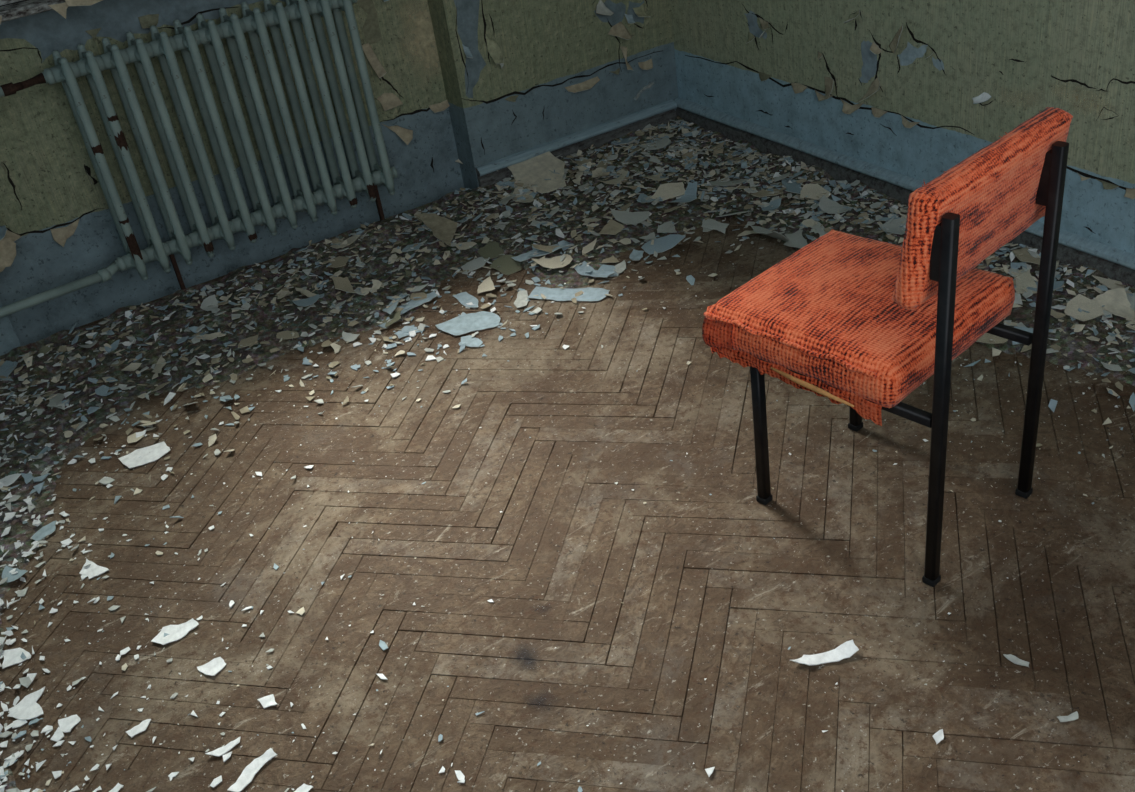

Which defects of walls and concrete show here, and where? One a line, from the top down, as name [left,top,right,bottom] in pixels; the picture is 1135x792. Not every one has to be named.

peeling [0,0,263,64]
crack [817,51,839,100]
peeling [843,9,945,103]
crack [1051,76,1135,120]